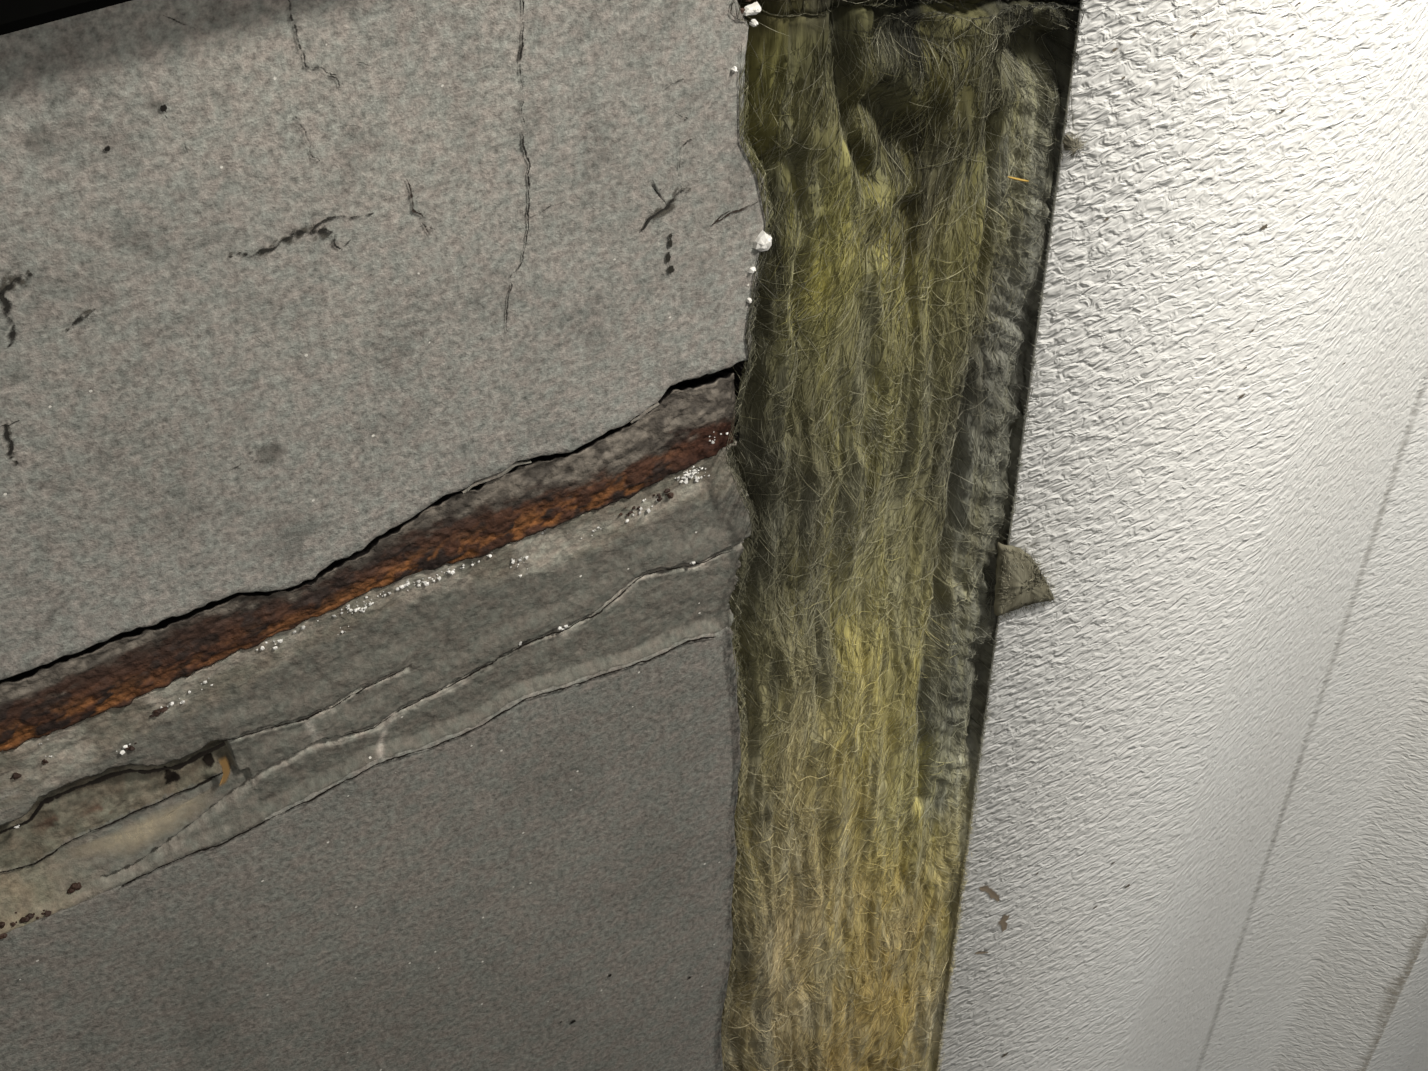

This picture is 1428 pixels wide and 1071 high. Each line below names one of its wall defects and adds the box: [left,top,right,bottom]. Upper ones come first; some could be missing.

crack [228,213,374,258]
crack [406,179,435,232]
crack [506,0,564,332]
corrosion [219,758,230,785]
crack [0,550,732,887]
spalling [0,361,751,939]